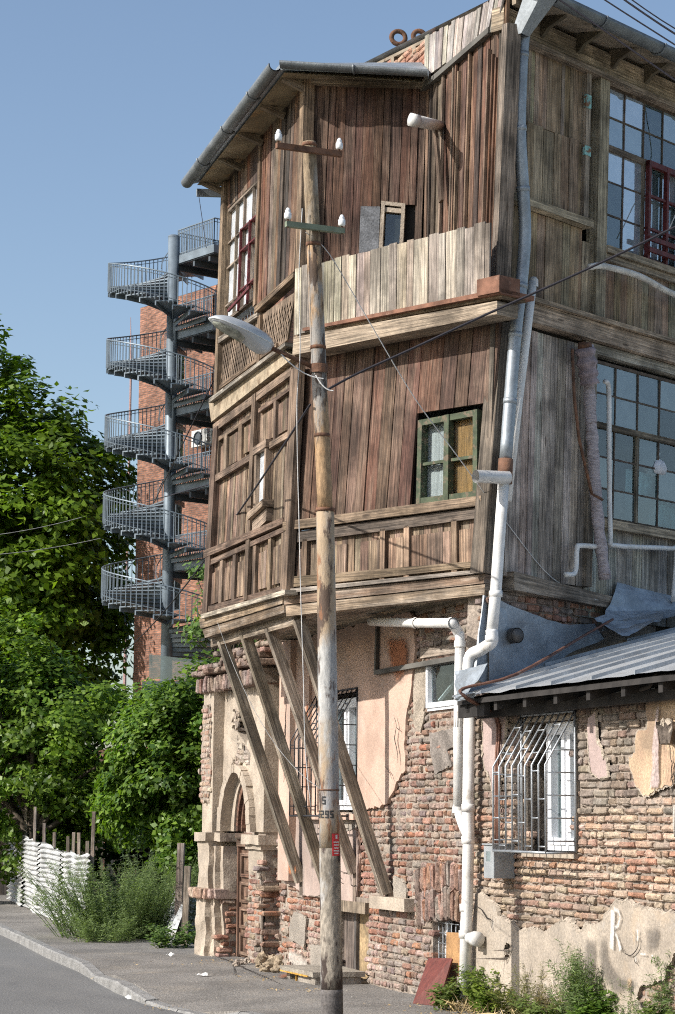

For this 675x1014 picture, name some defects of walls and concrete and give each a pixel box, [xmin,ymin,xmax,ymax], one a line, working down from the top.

spalling [198,704,212,804]
spalling [231,708,250,766]
peeling [480,716,509,802]
peeling [585,708,611,781]
peeling [628,700,675,798]
spalling [211,839,290,965]
peeling [470,892,675,1014]